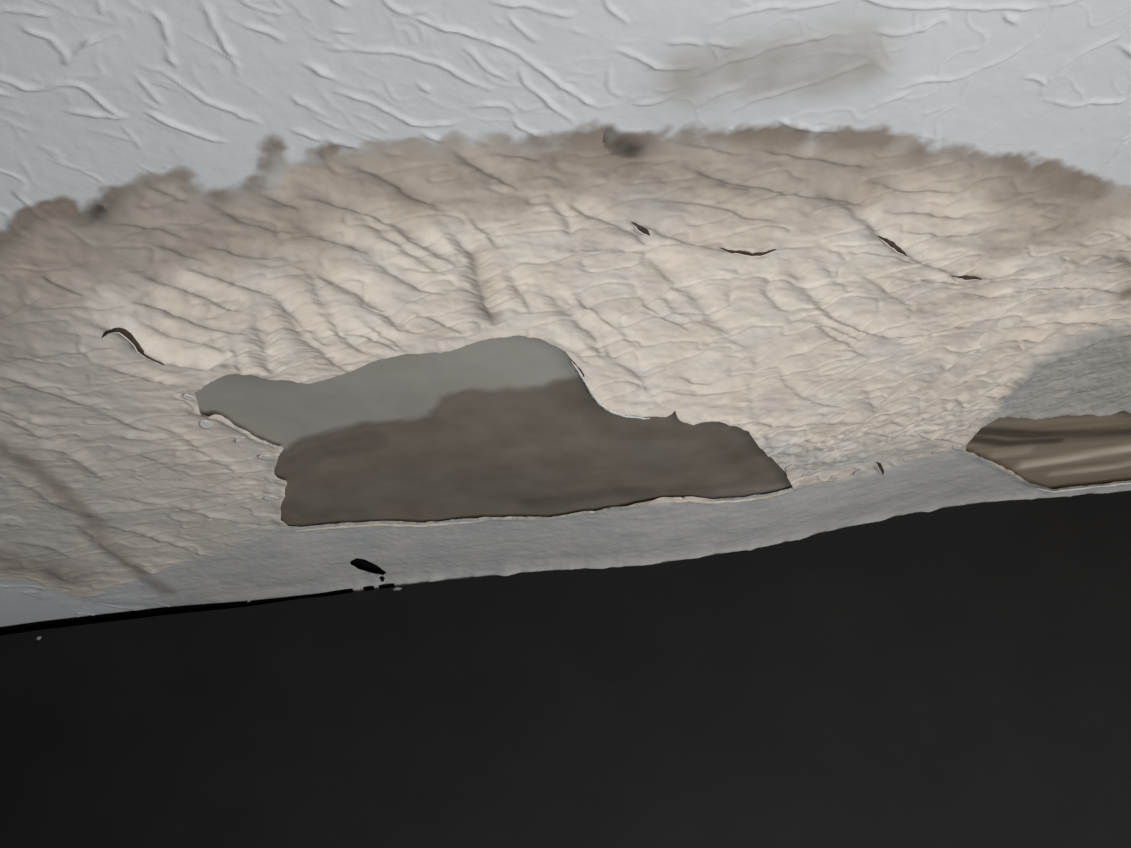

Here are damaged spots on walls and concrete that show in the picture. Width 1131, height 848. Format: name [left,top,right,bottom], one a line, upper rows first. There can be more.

peeling [183,336,838,532]
peeling [932,411,1131,493]